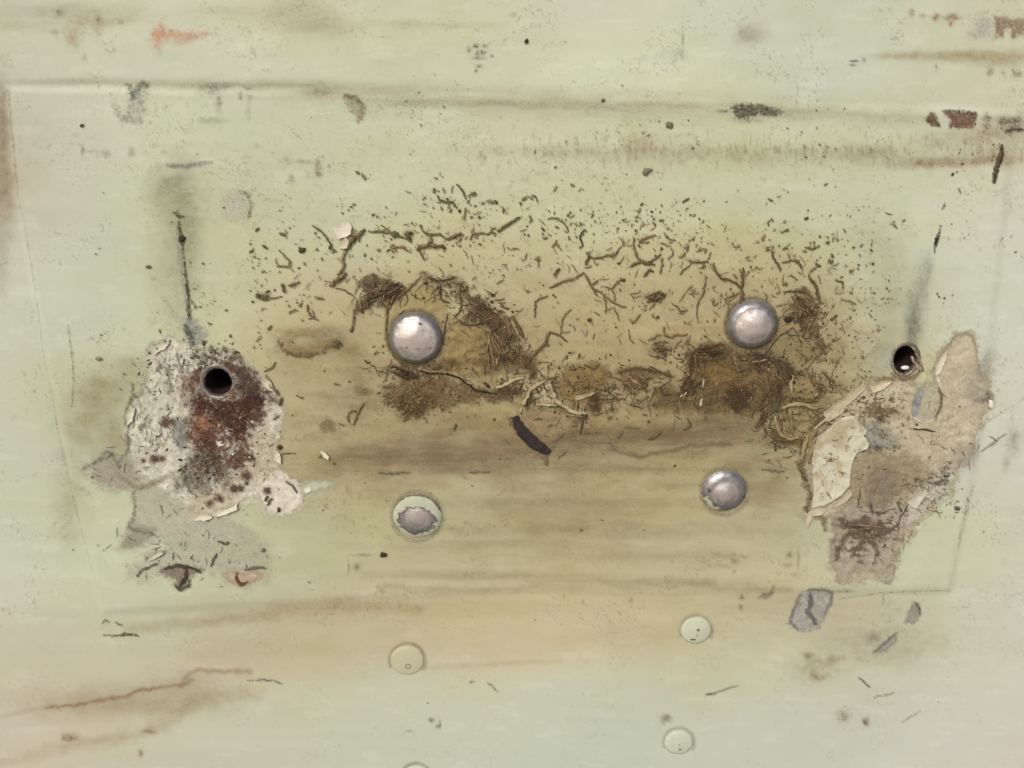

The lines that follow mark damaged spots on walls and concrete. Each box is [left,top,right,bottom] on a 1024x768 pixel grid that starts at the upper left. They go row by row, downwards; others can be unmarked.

peeling [82,320,334,582]
corrosion [141,351,278,506]
damp [278,331,332,359]
damp [423,397,604,465]
damp [619,379,774,446]
peeling [789,330,995,632]